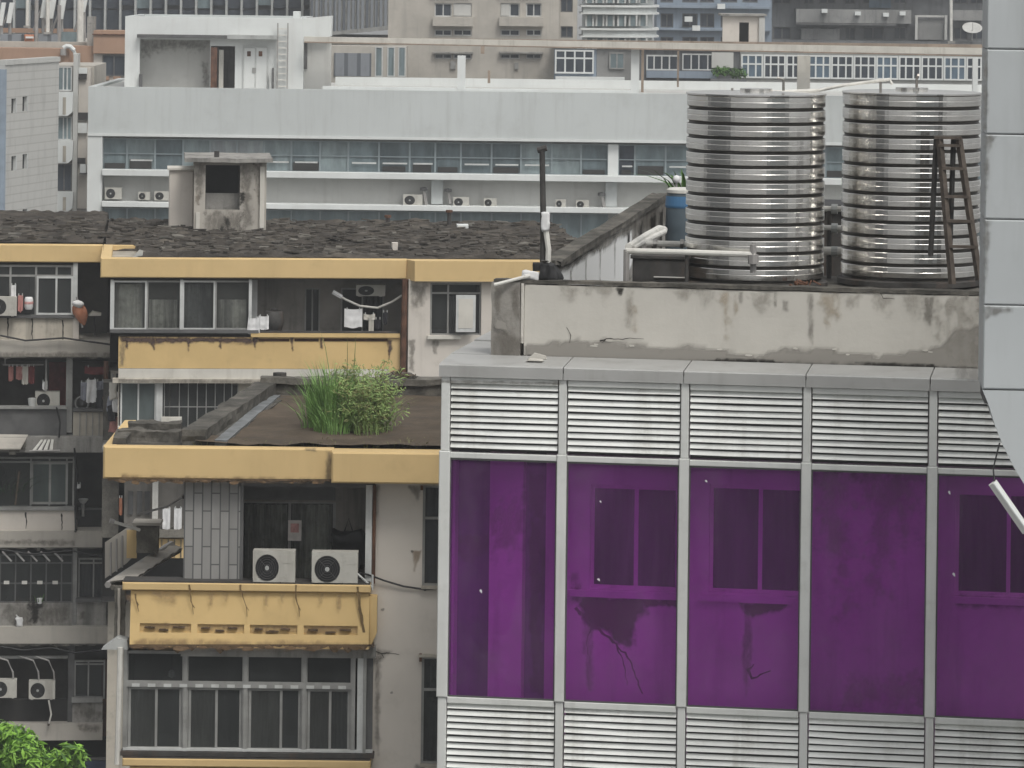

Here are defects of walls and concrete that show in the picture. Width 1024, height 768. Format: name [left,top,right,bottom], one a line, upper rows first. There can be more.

peeling [121,336,259,350]
water stain [577,589,676,646]
crack [575,607,643,694]